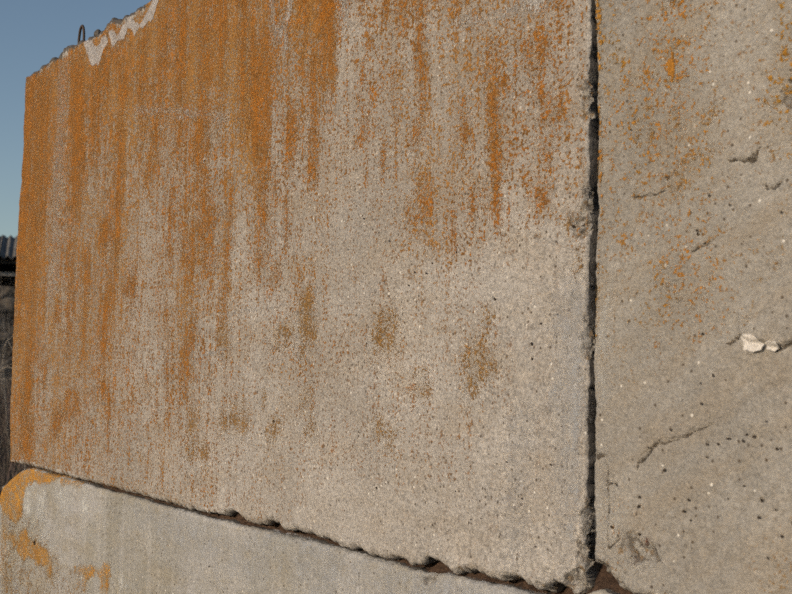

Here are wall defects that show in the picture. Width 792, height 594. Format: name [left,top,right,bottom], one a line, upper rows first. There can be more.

peeling [84,0,158,66]
corrosion [0,0,593,594]
peeling [741,334,779,352]
crack [636,425,709,467]